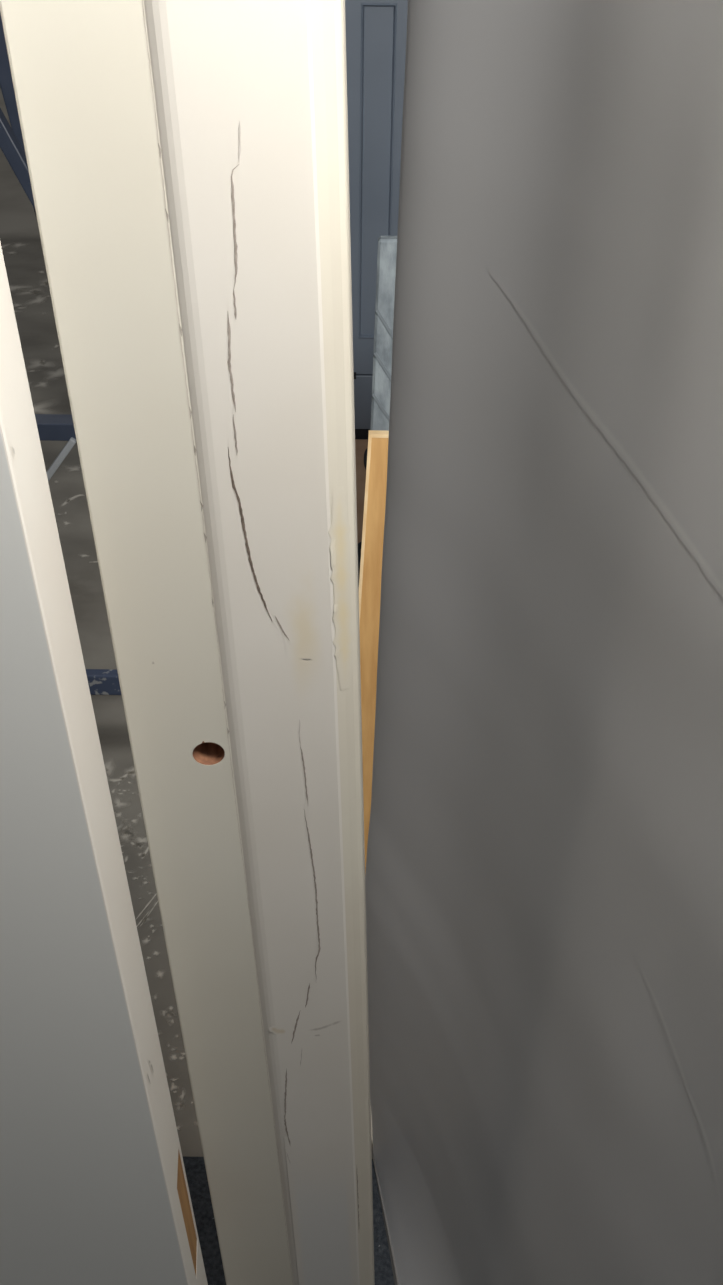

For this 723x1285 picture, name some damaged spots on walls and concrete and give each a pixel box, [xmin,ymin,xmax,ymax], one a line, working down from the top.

crack [228,121,290,641]
crack [284,719,321,1162]